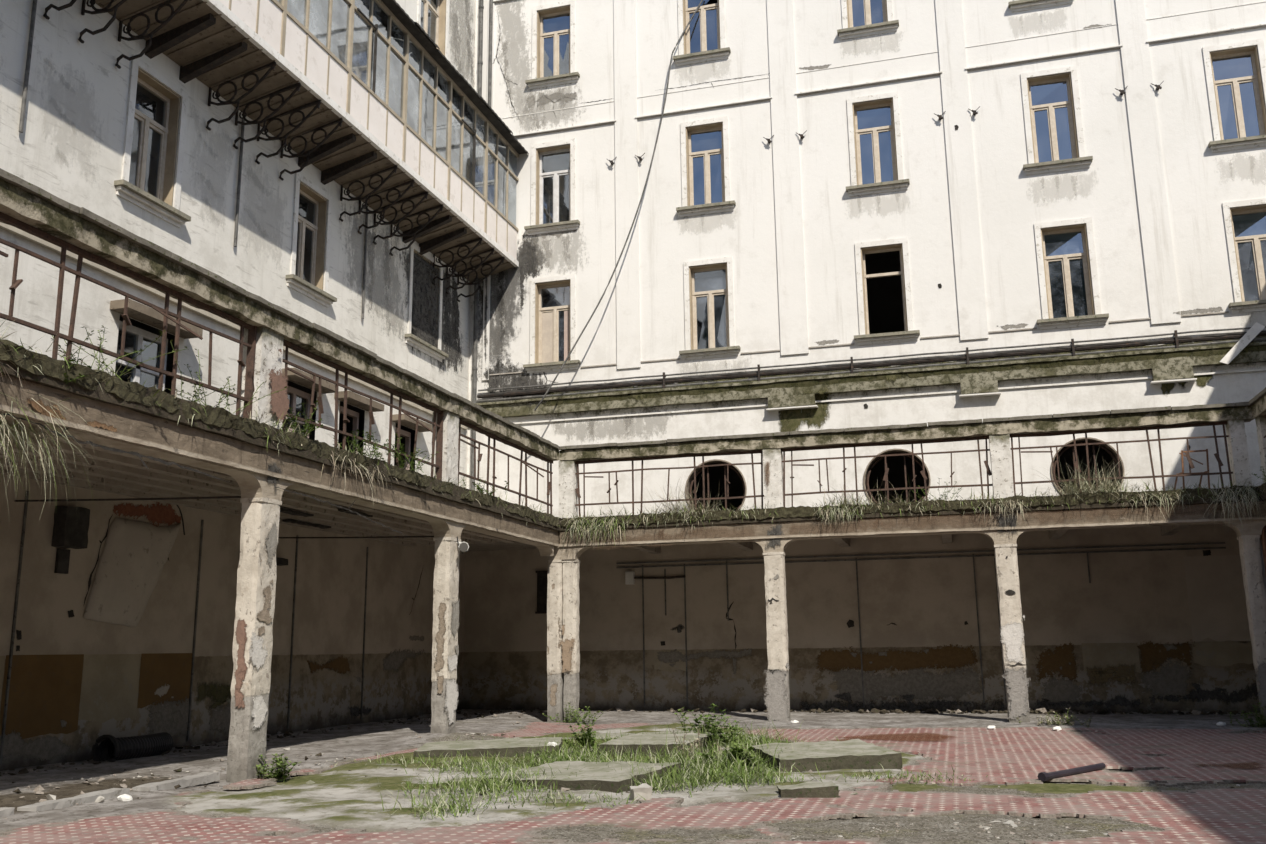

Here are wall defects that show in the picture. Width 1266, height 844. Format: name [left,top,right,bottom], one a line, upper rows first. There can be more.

leakage [399,236,554,405]
leakage [1161,375,1208,395]
leakage [780,392,825,432]
flaking render [113,502,181,527]
peeling [208,521,278,735]
flaking render [147,683,192,737]
flaking render [307,655,365,682]
flaking render [382,599,460,725]
leakage [800,692,1004,712]
leakage [1035,664,1258,707]